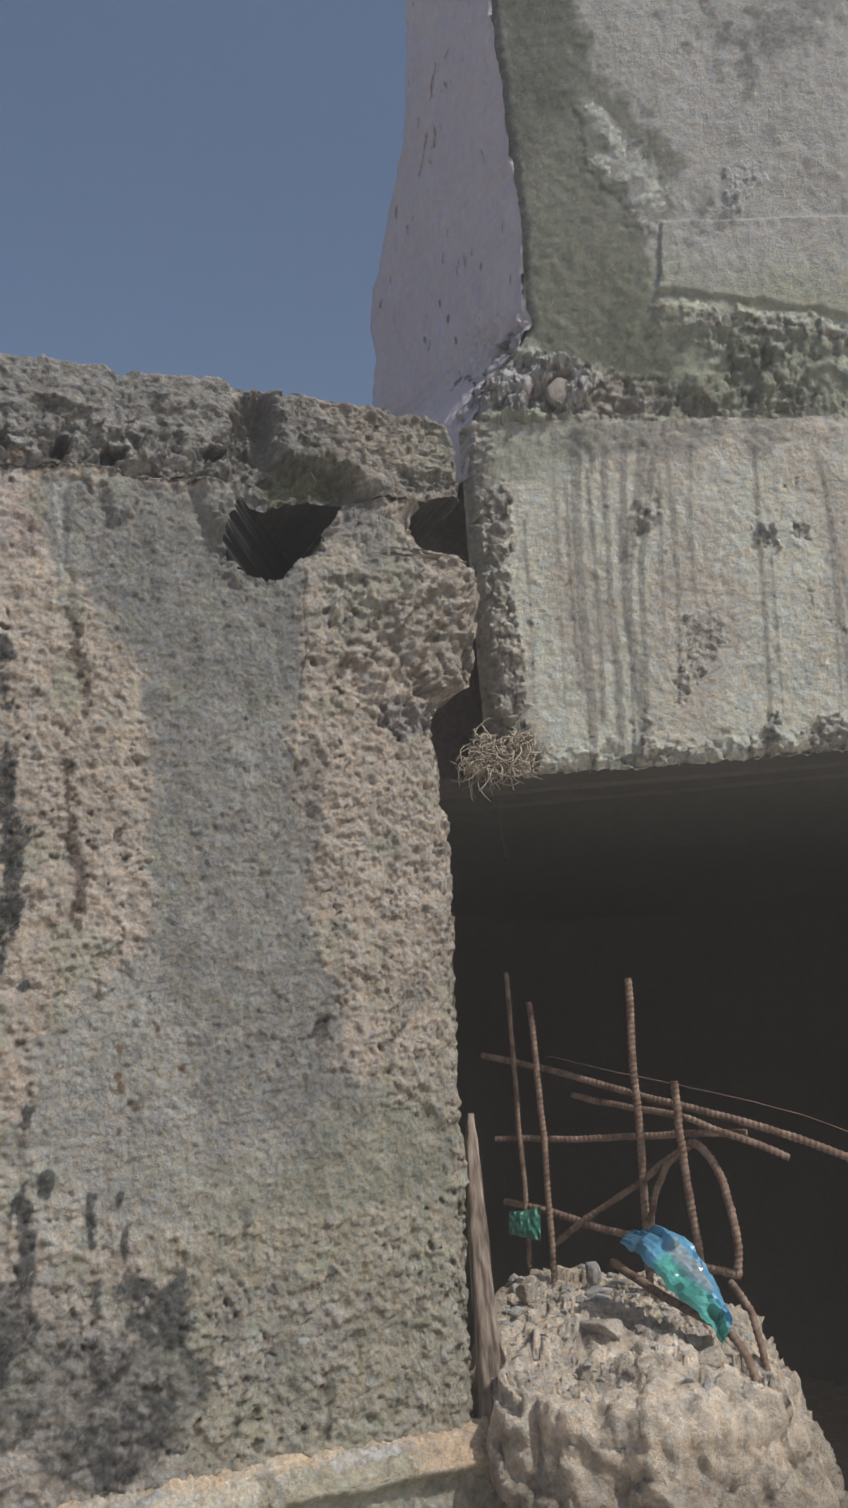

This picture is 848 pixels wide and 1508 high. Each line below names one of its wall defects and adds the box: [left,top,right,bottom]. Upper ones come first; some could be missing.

leakage [491,0,823,396]
leakage [0,633,17,710]
leakage [52,481,93,715]
spalling [199,392,335,582]
leakage [553,416,723,765]
leakage [753,448,783,740]
leakage [0,741,37,975]
leakage [64,758,91,929]
leakage [19,1105,35,1129]
leakage [0,1169,55,1387]
leakage [84,1192,97,1248]
leakage [40,1227,209,1491]